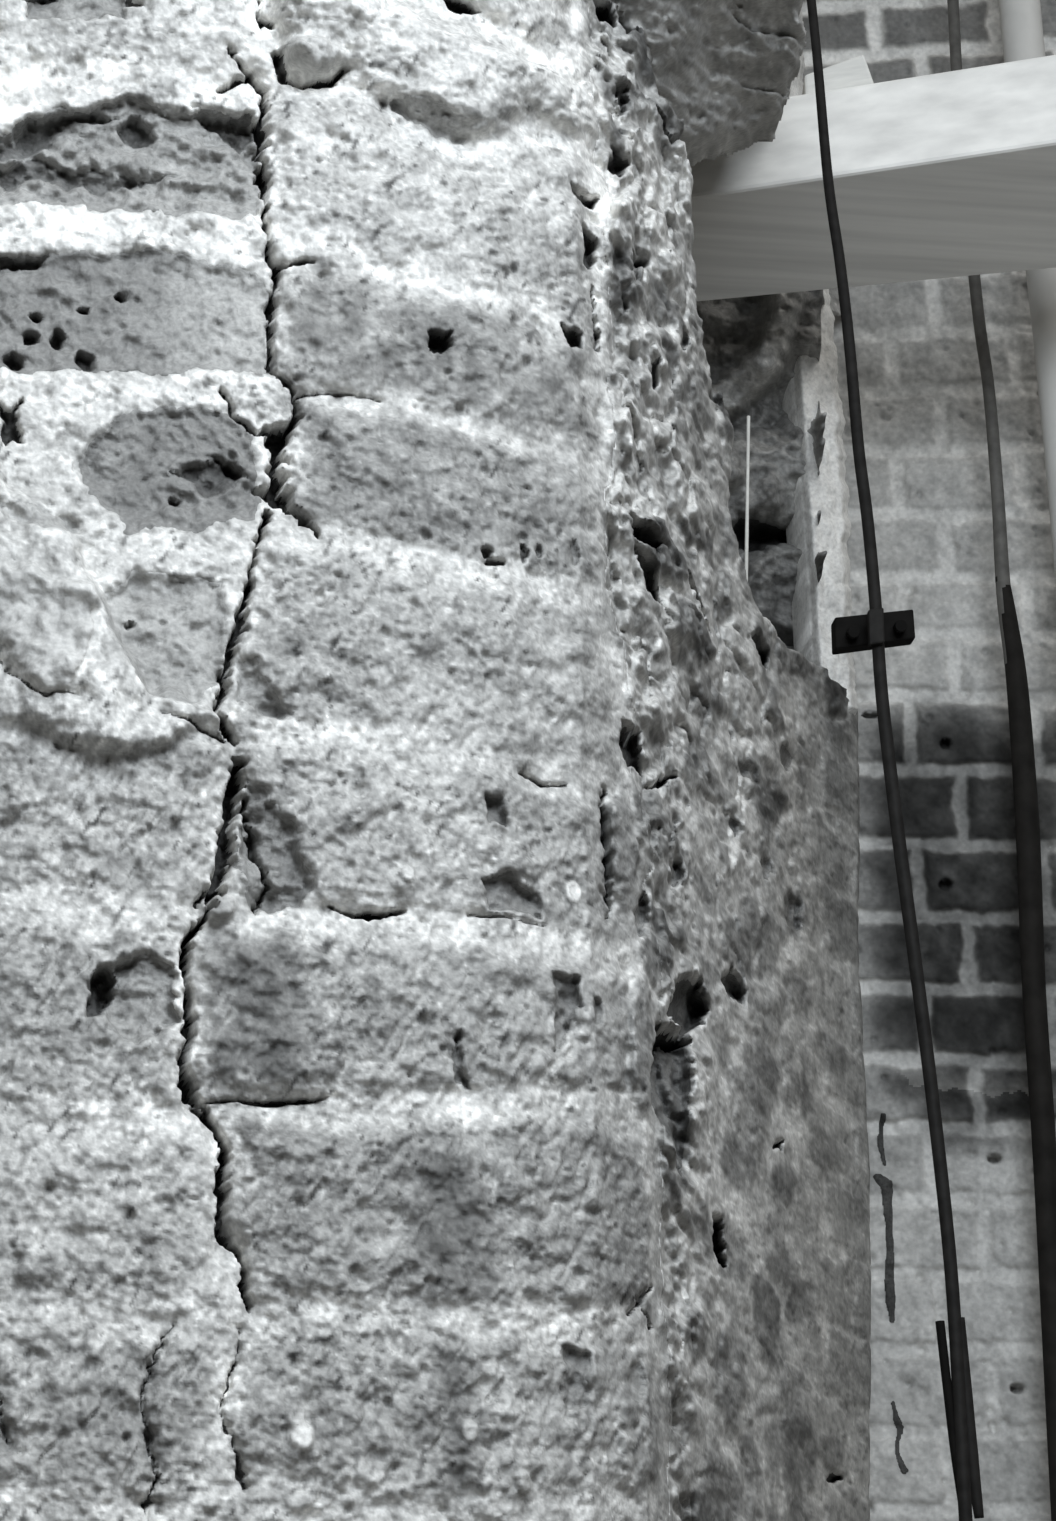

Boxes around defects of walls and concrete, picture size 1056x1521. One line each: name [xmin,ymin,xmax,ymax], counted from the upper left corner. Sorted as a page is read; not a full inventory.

spalling [0,96,260,220]
spalling [607,149,629,177]
spalling [0,248,269,376]
spalling [79,405,262,535]
hole [632,526,658,601]
hole [733,518,787,552]
crack [177,78,371,1311]
hole [619,726,639,771]
hole [650,979,705,1177]
crack [0,1402,8,1444]
crack [140,1338,163,1510]
crack [220,1346,245,1490]